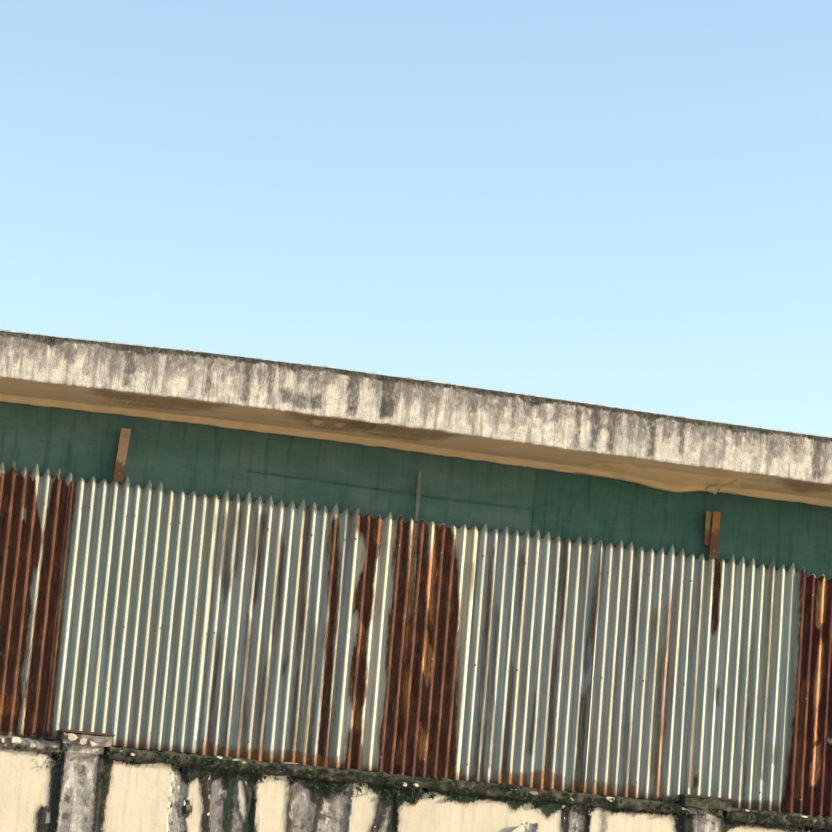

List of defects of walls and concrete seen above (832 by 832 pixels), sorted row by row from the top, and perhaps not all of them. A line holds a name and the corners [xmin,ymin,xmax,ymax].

leakage [0,331,832,479]
rust [0,467,76,738]
rust [201,510,382,771]
rust [378,515,461,780]
rust [738,567,832,817]
leakage [36,751,262,832]
leakage [286,776,351,832]
leakage [367,783,592,832]
leakage [601,808,706,832]
leakage [721,816,832,832]